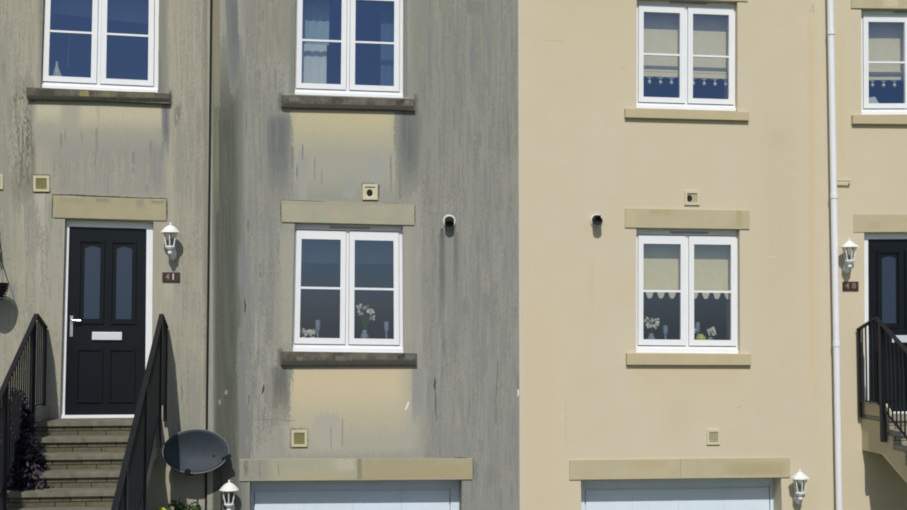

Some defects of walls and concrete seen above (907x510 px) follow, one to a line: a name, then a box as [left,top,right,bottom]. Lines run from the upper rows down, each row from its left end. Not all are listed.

leakage [0,0,220,436]
leakage [236,0,636,510]